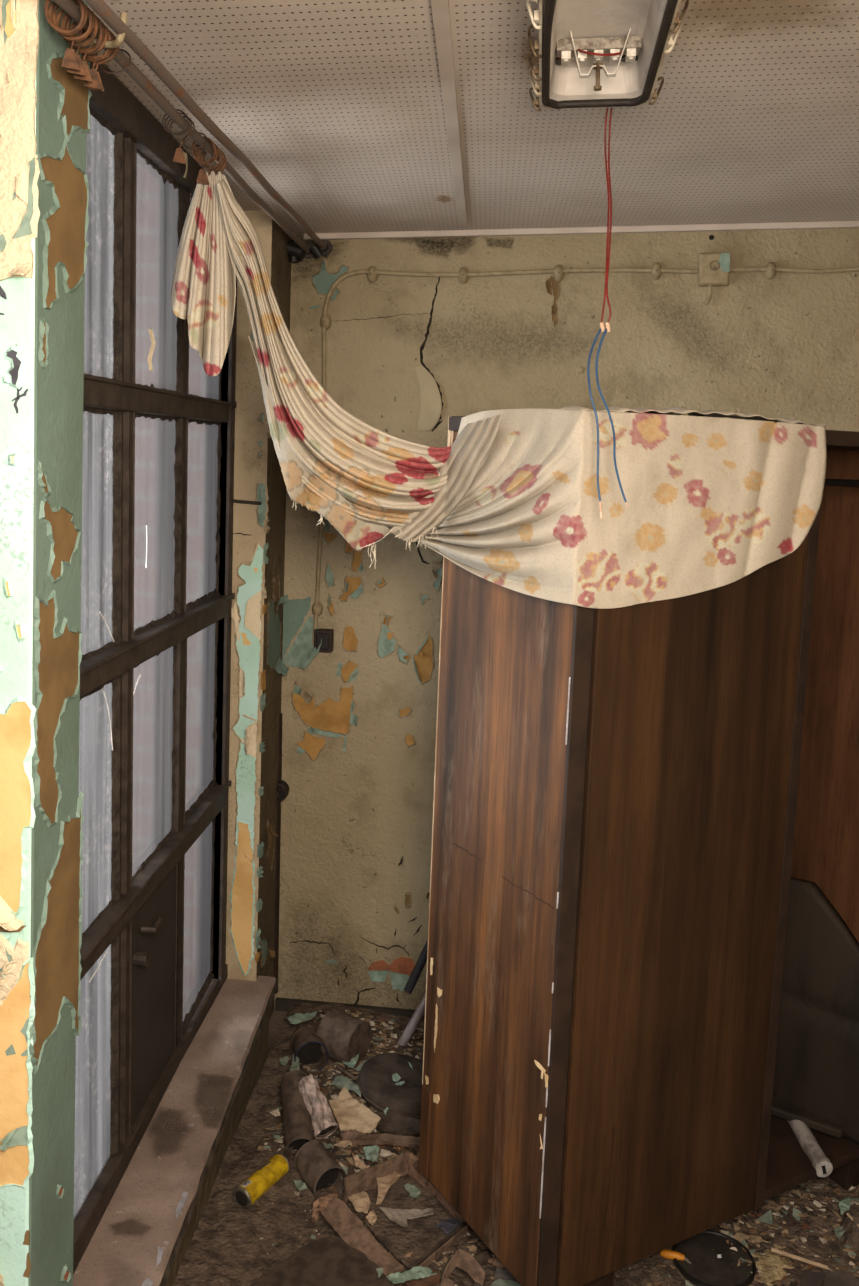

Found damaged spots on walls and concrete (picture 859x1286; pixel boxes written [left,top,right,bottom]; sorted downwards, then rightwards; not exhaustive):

peeling [0,0,92,310]
peeling [3,343,26,389]
crack [335,277,443,432]
peeling [8,452,19,466]
peeling [419,563,443,606]
peeling [376,612,435,685]
peeling [229,481,388,976]
peeling [0,461,84,1189]
crack [290,917,422,1004]
peeling [364,955,416,991]
peeling [23,1230,31,1278]
peeling [60,1263,71,1286]